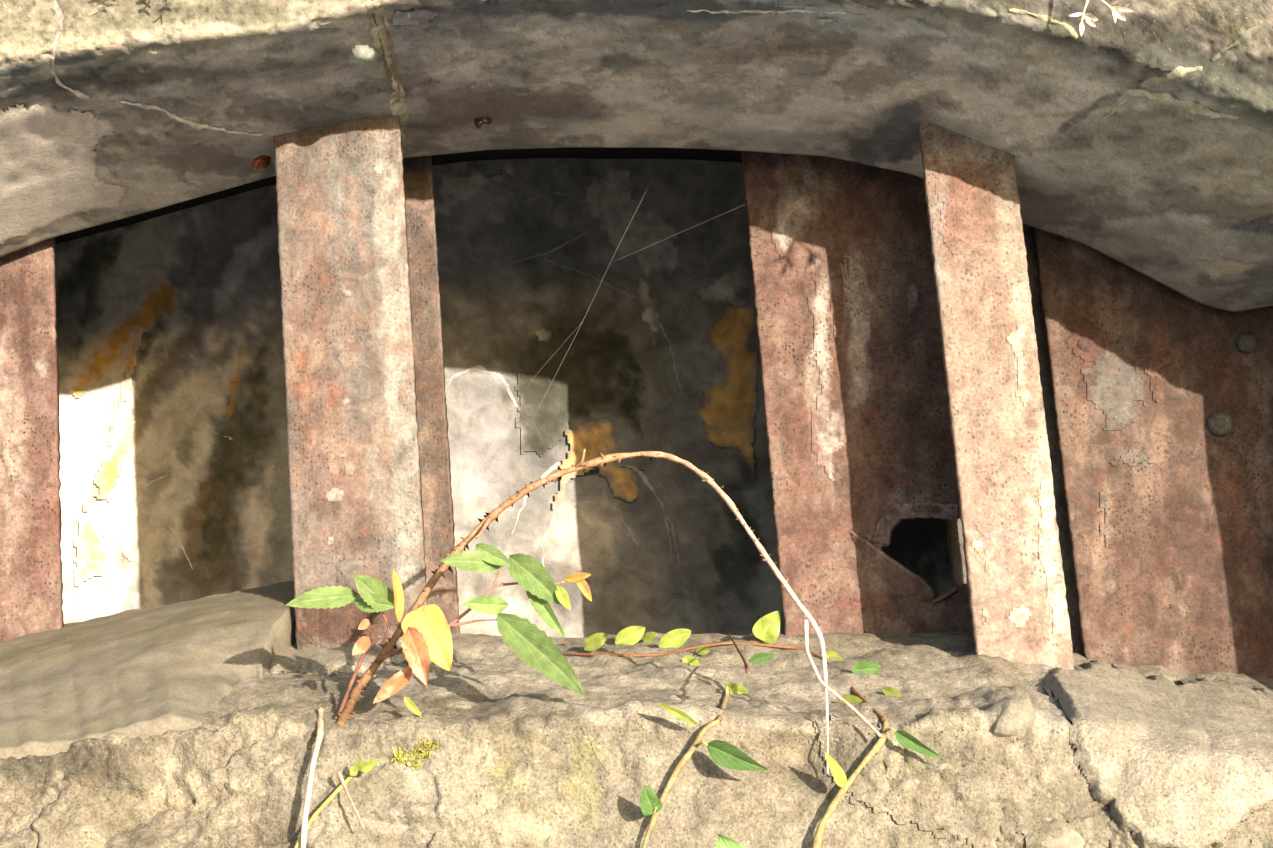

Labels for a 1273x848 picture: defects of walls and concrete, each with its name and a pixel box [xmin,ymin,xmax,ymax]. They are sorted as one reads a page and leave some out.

crack [50,0,89,99]
crack [121,101,263,136]
crack [366,0,409,155]
rust [933,164,999,255]
rust [827,181,859,339]
rust [299,586,377,647]